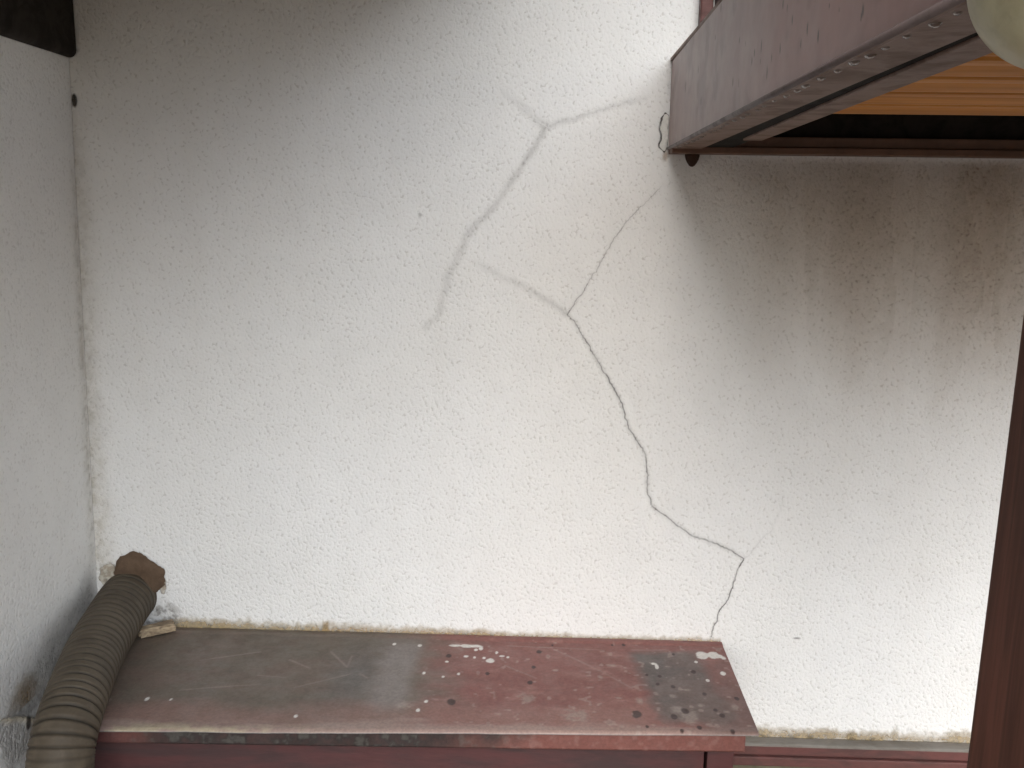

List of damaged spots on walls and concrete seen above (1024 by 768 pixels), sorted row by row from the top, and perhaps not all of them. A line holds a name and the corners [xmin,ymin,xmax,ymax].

crack [707,540,744,631]